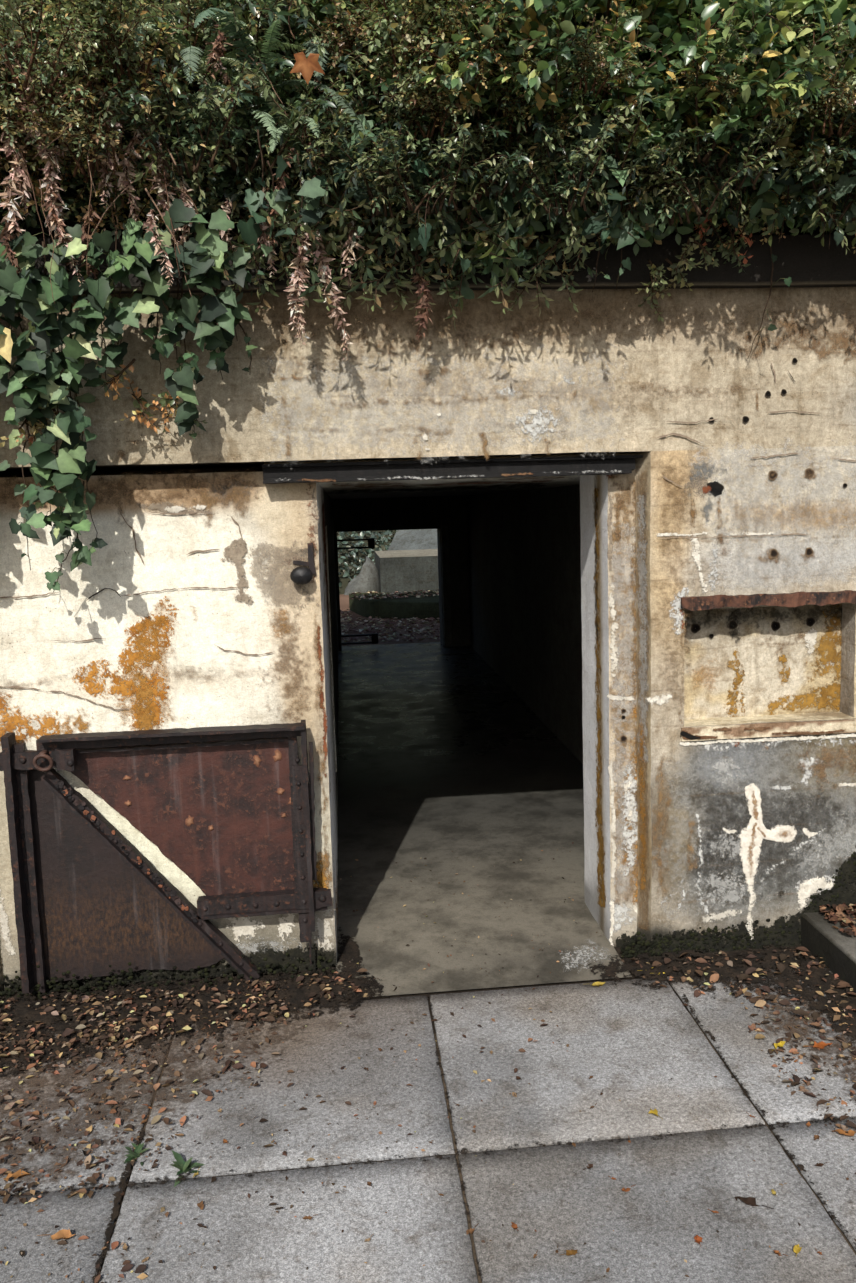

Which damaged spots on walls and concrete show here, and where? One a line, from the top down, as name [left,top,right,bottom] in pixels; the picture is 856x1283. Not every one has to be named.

crack [0,508,242,600]
corrosion [0,692,90,745]
crack [0,686,130,710]
crack [54,636,105,644]
corrosion [72,596,179,730]
crack [217,646,275,656]
damp [607,471,856,957]
corrosion [726,650,745,717]
corrosion [768,604,842,715]
corrosion [253,749,282,767]